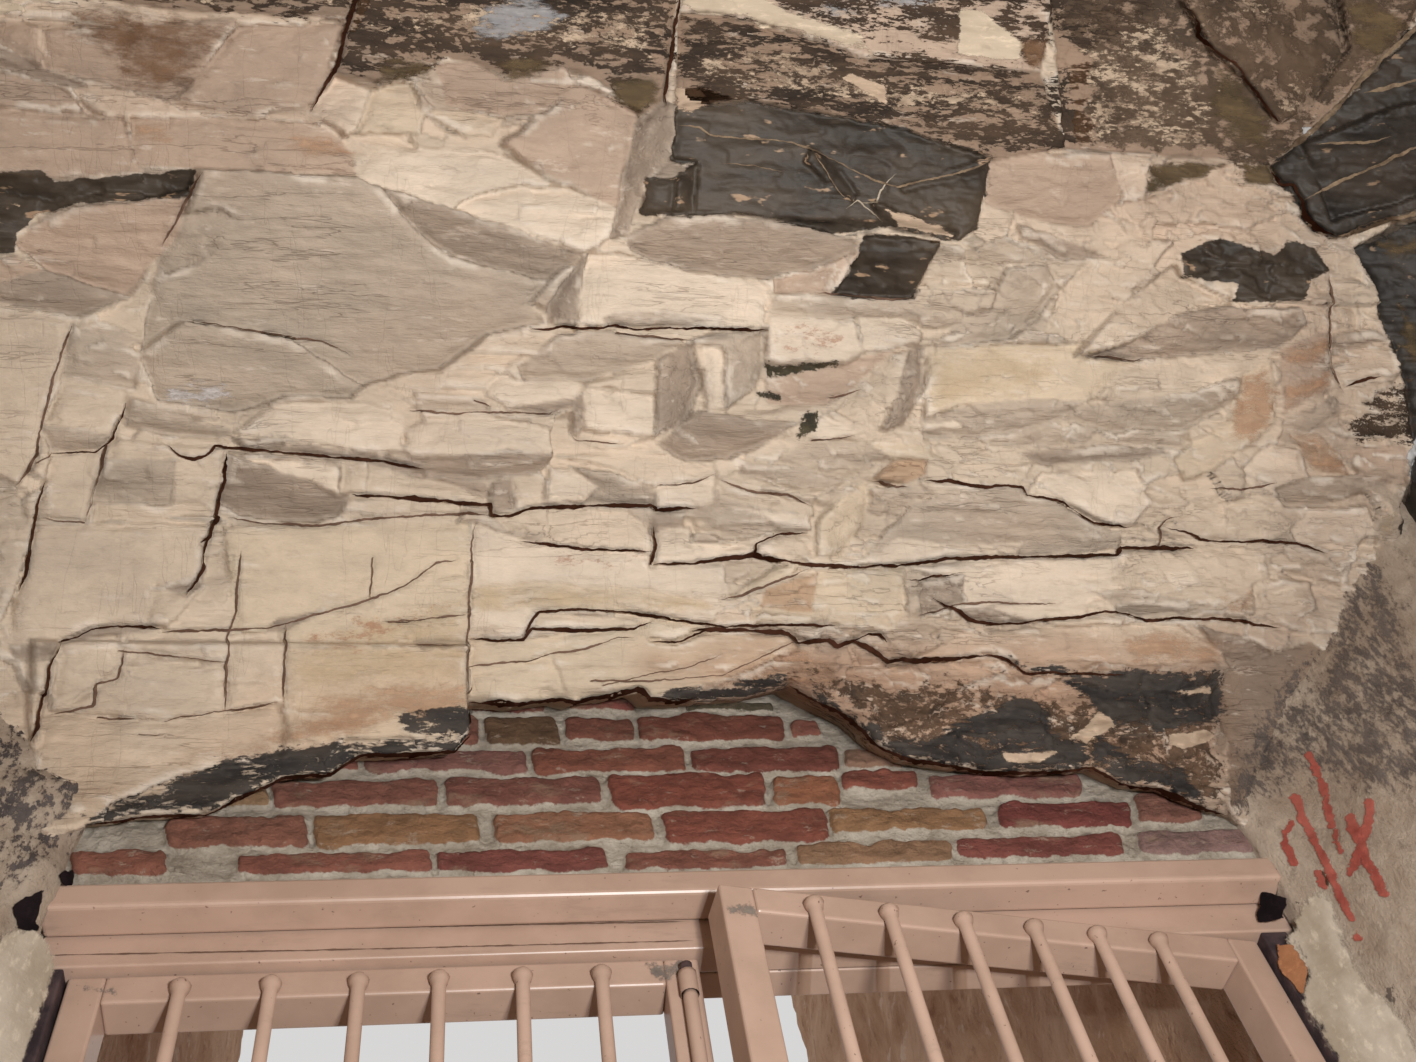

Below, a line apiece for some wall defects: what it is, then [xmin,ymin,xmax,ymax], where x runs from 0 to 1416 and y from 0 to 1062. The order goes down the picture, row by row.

leakage [371,0,653,58]
crack [312,0,358,110]
leakage [375,59,436,84]
leakage [612,79,658,113]
leakage [699,49,1051,122]
crack [188,319,347,353]
crack [15,326,126,592]
crack [30,445,1328,826]
spalling [1175,685,1211,695]
spalling [1069,712,1116,743]
spalling [1168,729,1215,749]
spalling [1002,751,1057,763]